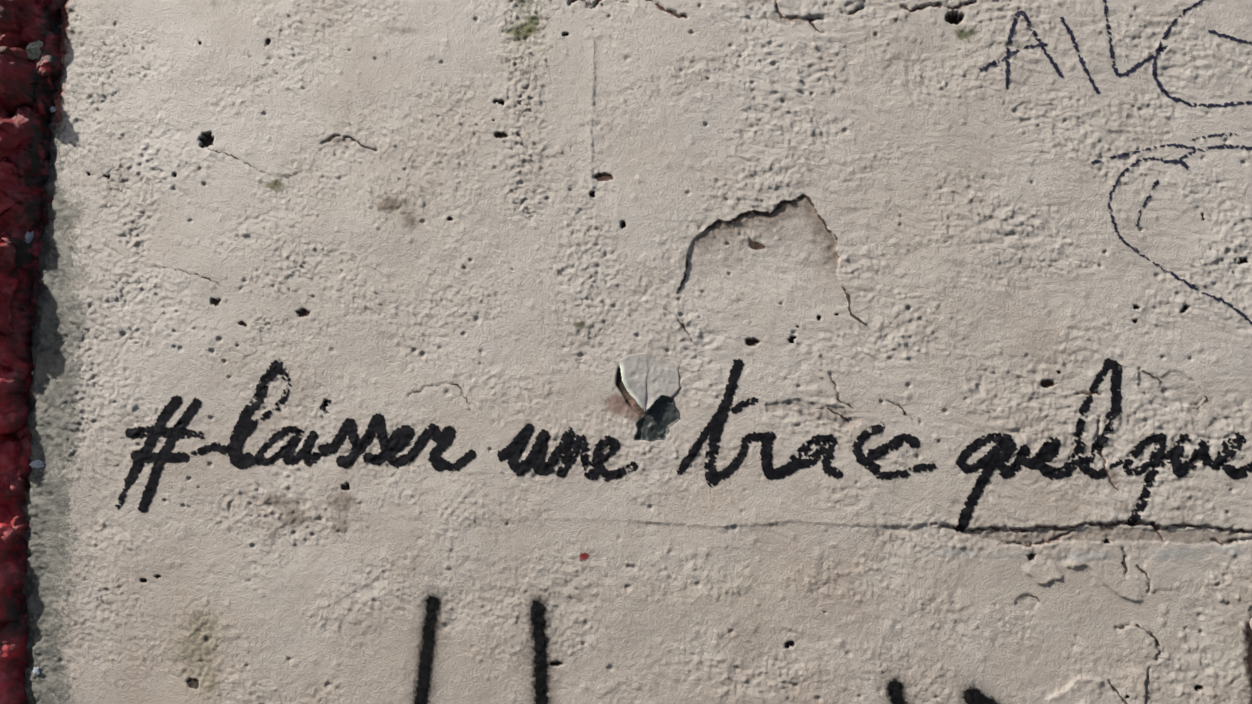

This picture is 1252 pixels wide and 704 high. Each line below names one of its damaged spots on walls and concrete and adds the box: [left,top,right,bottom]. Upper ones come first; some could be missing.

crack [569,0,687,18]
crack [775,0,863,32]
crack [902,1,977,12]
peeling [694,194,839,263]
peeling [817,286,867,325]
crack [1076,391,1117,489]
crack [941,521,1252,591]
crack [1109,624,1161,704]